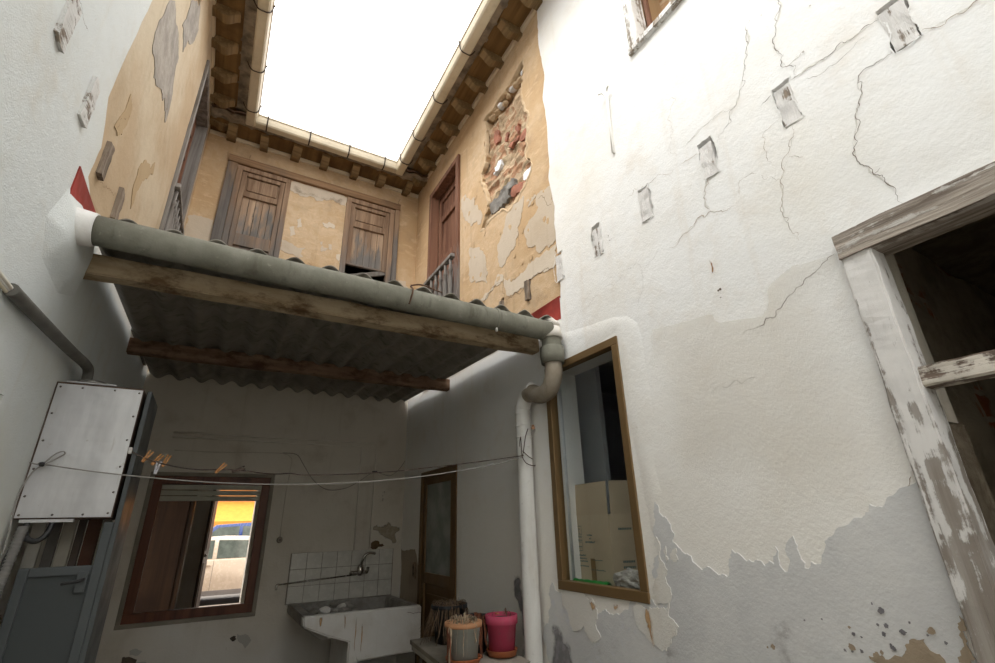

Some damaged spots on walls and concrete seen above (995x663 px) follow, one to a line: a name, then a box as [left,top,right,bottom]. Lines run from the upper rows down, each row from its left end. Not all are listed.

flaking render [461,58,564,302]
crack [669,27,748,162]
crack [634,96,801,301]
crack [746,253,835,331]
crack [772,0,899,202]
peeling [370,523,418,604]
peeling [543,470,977,663]